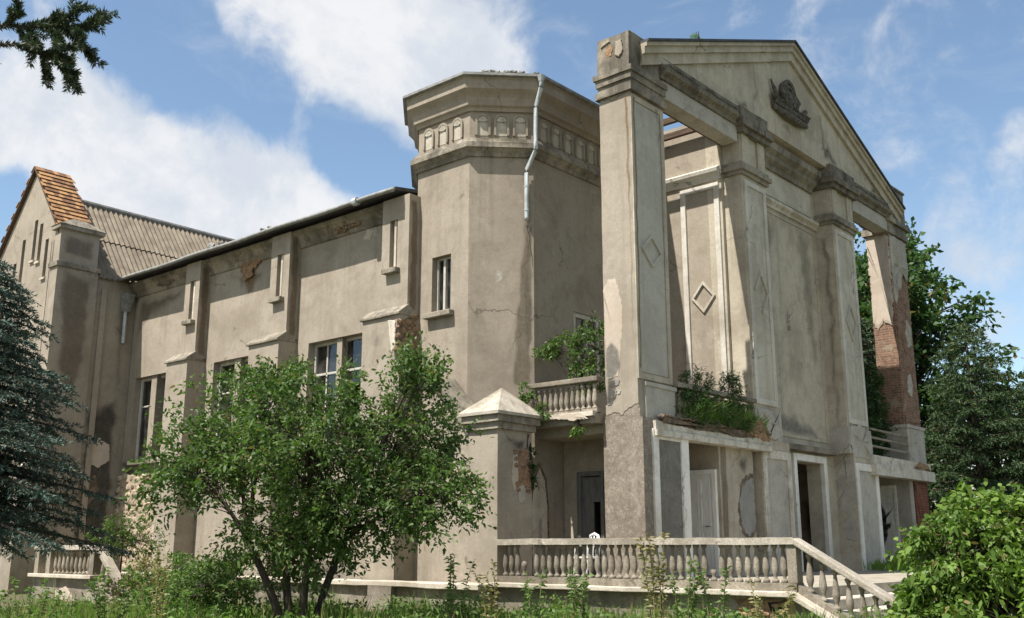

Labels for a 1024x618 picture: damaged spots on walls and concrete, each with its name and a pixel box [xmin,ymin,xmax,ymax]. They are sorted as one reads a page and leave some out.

spalling [601,39,623,57]
flaking render [388,314,419,390]
flaking render [866,233,920,425]
water stain [77,406,115,570]
flaking render [511,448,533,503]
peeling [738,473,756,538]
flaking render [914,462,931,530]